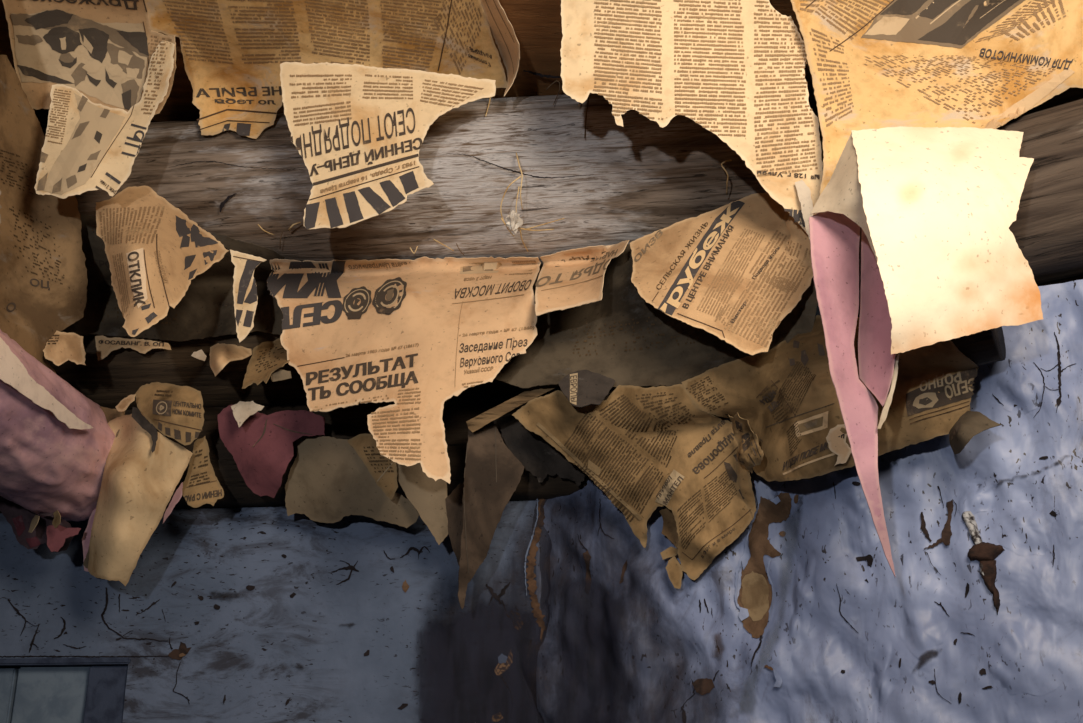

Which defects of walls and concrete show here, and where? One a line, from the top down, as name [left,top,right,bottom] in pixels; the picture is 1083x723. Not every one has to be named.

peeling [795,180,813,240]
spalling [856,554,873,567]
damp [418,494,721,723]